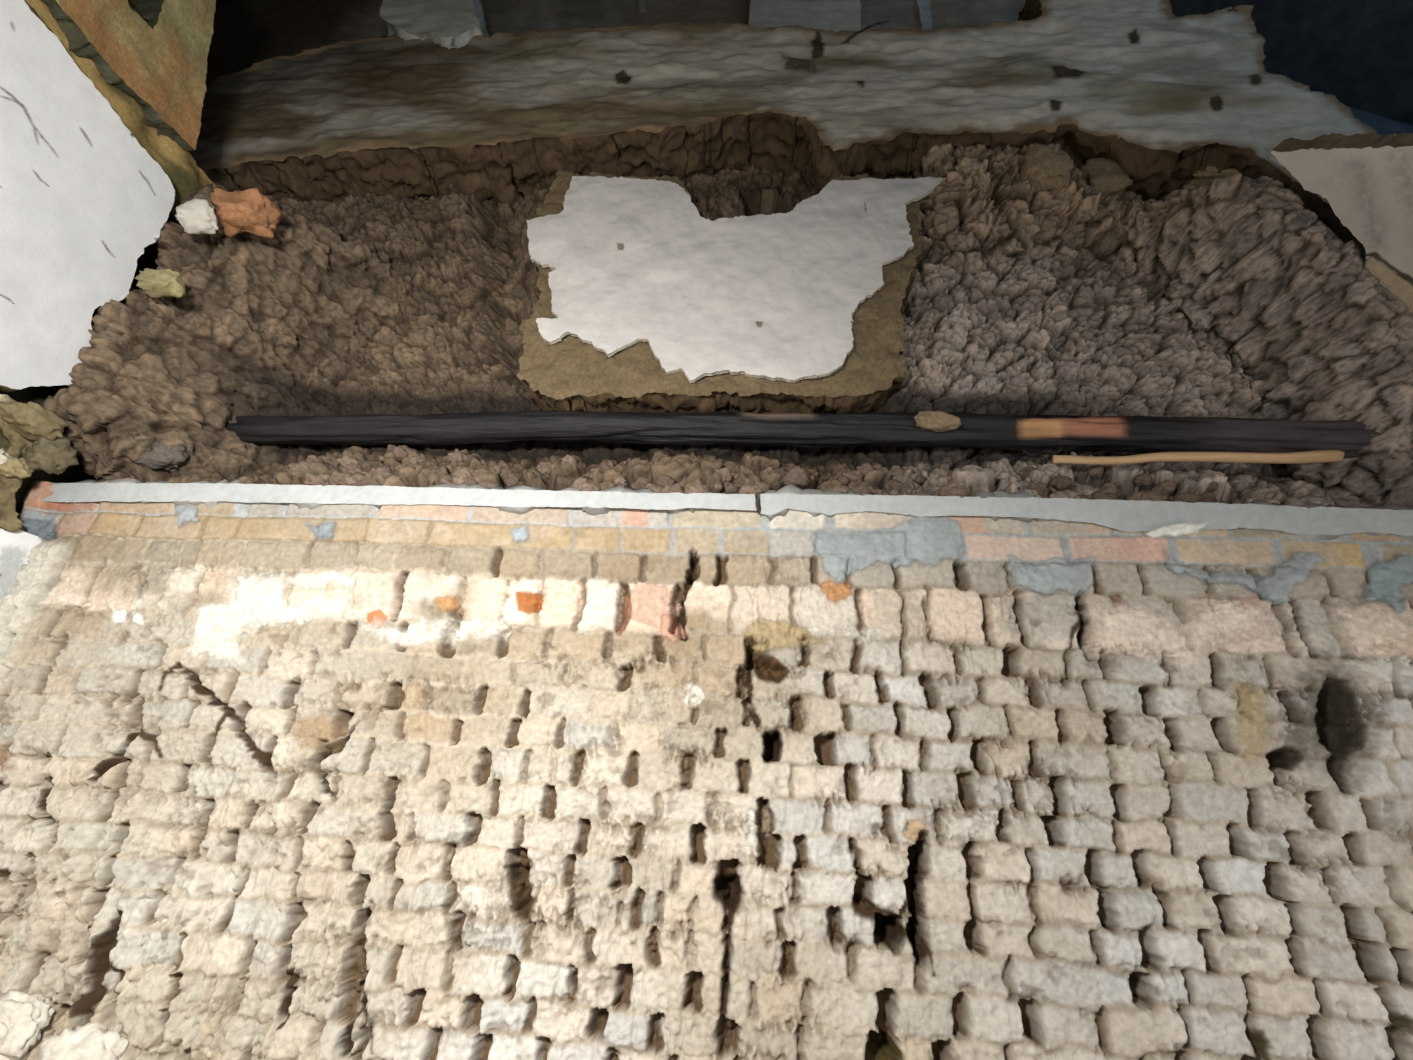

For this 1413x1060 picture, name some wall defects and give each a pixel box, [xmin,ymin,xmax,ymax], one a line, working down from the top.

spalling [1020,143,1133,202]
spalling [1180,166,1240,188]
spalling [210,187,282,238]
spalling [134,268,186,298]
spalling [1365,257,1413,312]
crack [158,662,273,766]